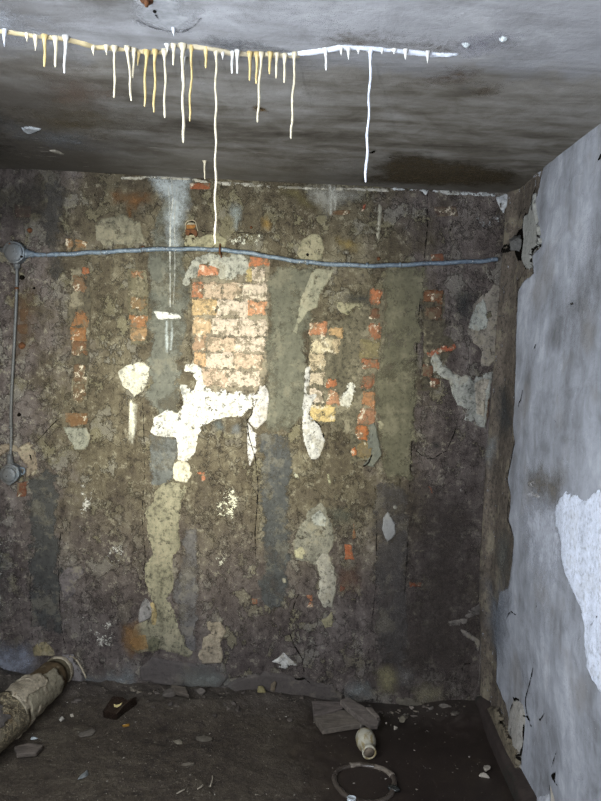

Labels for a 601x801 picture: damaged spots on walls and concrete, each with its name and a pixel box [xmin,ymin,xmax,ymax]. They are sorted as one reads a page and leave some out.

leakage [0,29,486,58]
leakage [121,156,514,259]
peeling [118,362,150,396]
spalling [294,234,385,467]
spalling [127,233,270,664]
spalling [420,169,543,768]
peeling [292,502,345,628]
flaking render [344,524,356,560]
peeling [382,505,398,541]
peeling [527,490,601,692]
peeling [272,653,296,669]
crack [508,662,543,761]